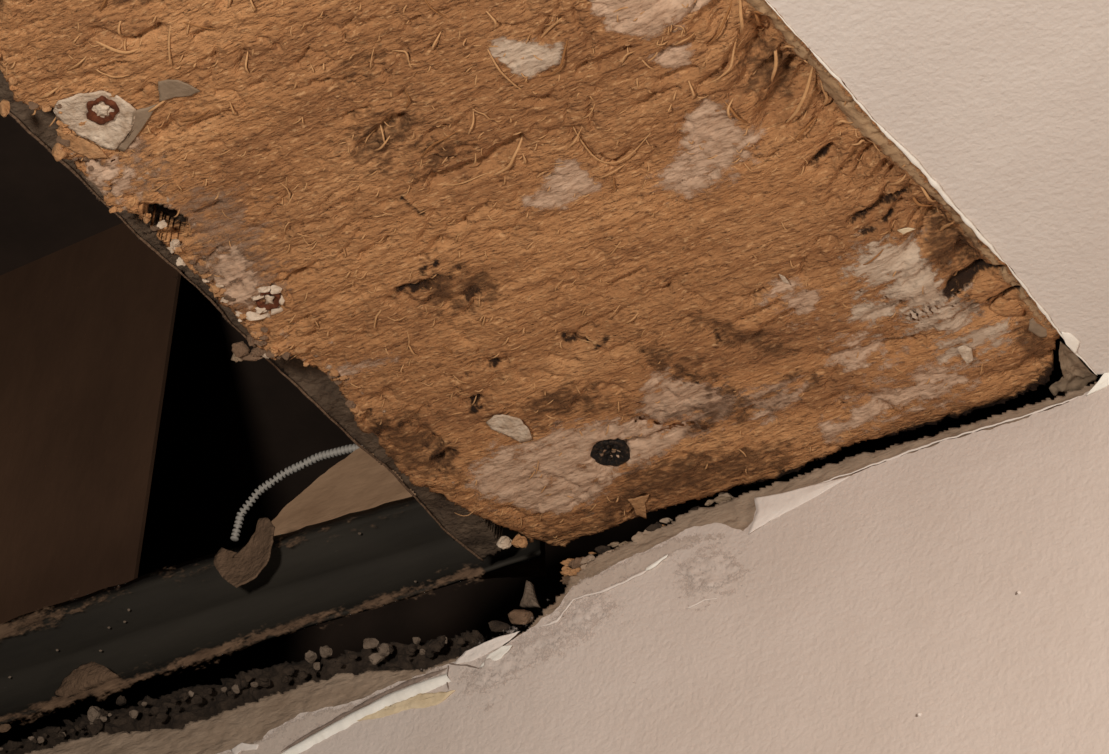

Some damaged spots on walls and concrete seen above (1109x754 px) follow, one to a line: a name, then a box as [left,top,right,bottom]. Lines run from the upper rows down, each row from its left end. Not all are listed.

peeling [589,0,710,36]
peeling [489,36,564,77]
peeling [648,44,692,68]
water stain [744,39,795,104]
peeling [56,129,169,204]
peeling [522,159,601,209]
peeling [655,99,764,199]
water stain [925,211,979,273]
water stain [528,382,606,425]
water stain [883,363,1054,438]
spalling [0,233,1109,754]
water stain [592,440,827,527]